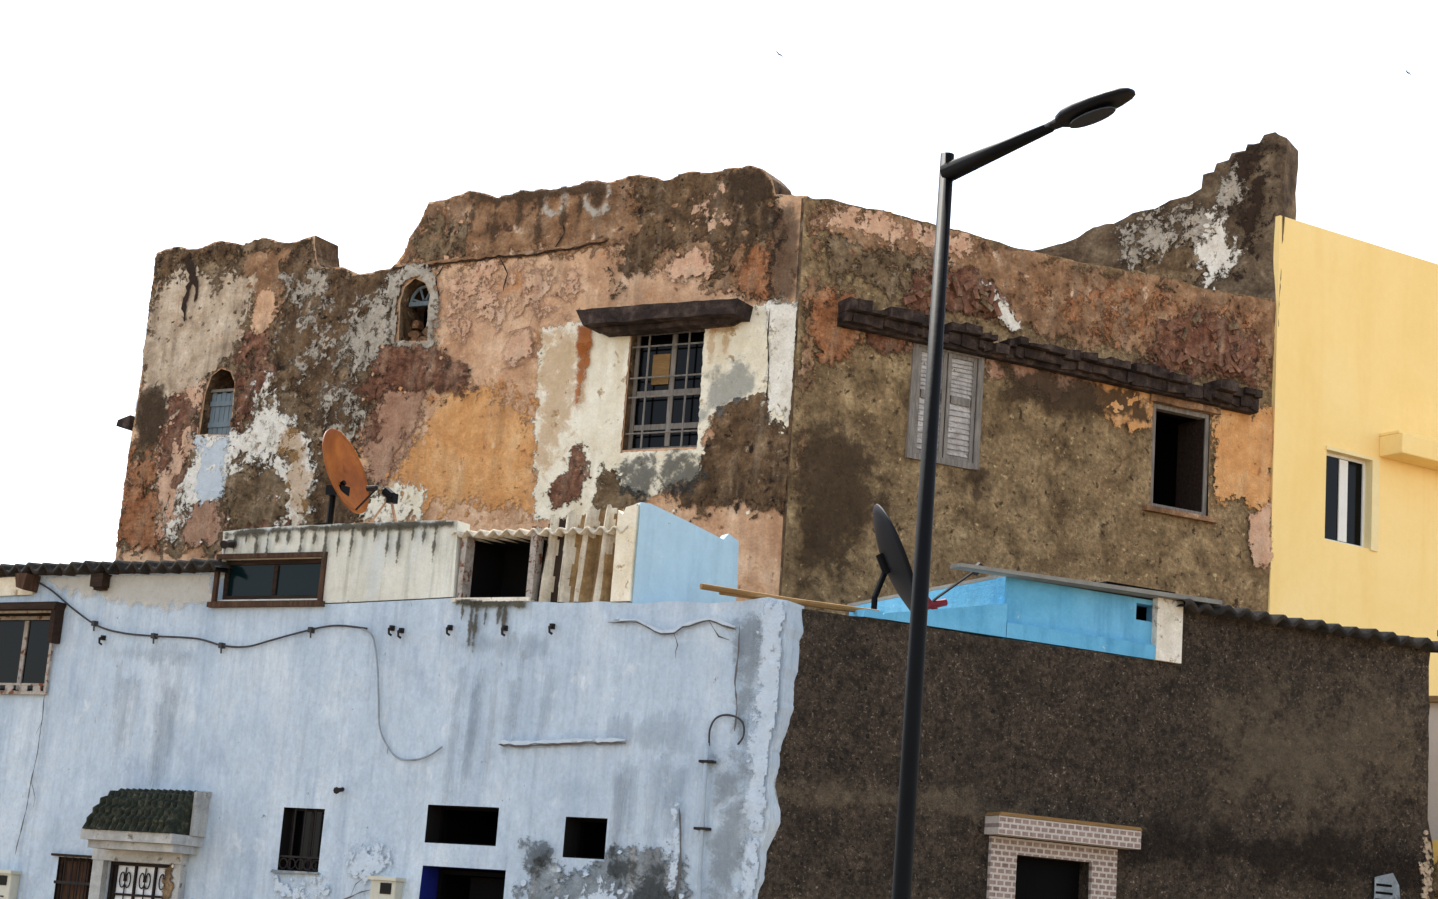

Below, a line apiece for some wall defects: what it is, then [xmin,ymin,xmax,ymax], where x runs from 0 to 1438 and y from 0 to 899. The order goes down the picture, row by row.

peeling [1113,138,1281,290]
peeling [44,166,1021,609]
spalling [1136,303,1274,572]
spalling [512,802,693,899]